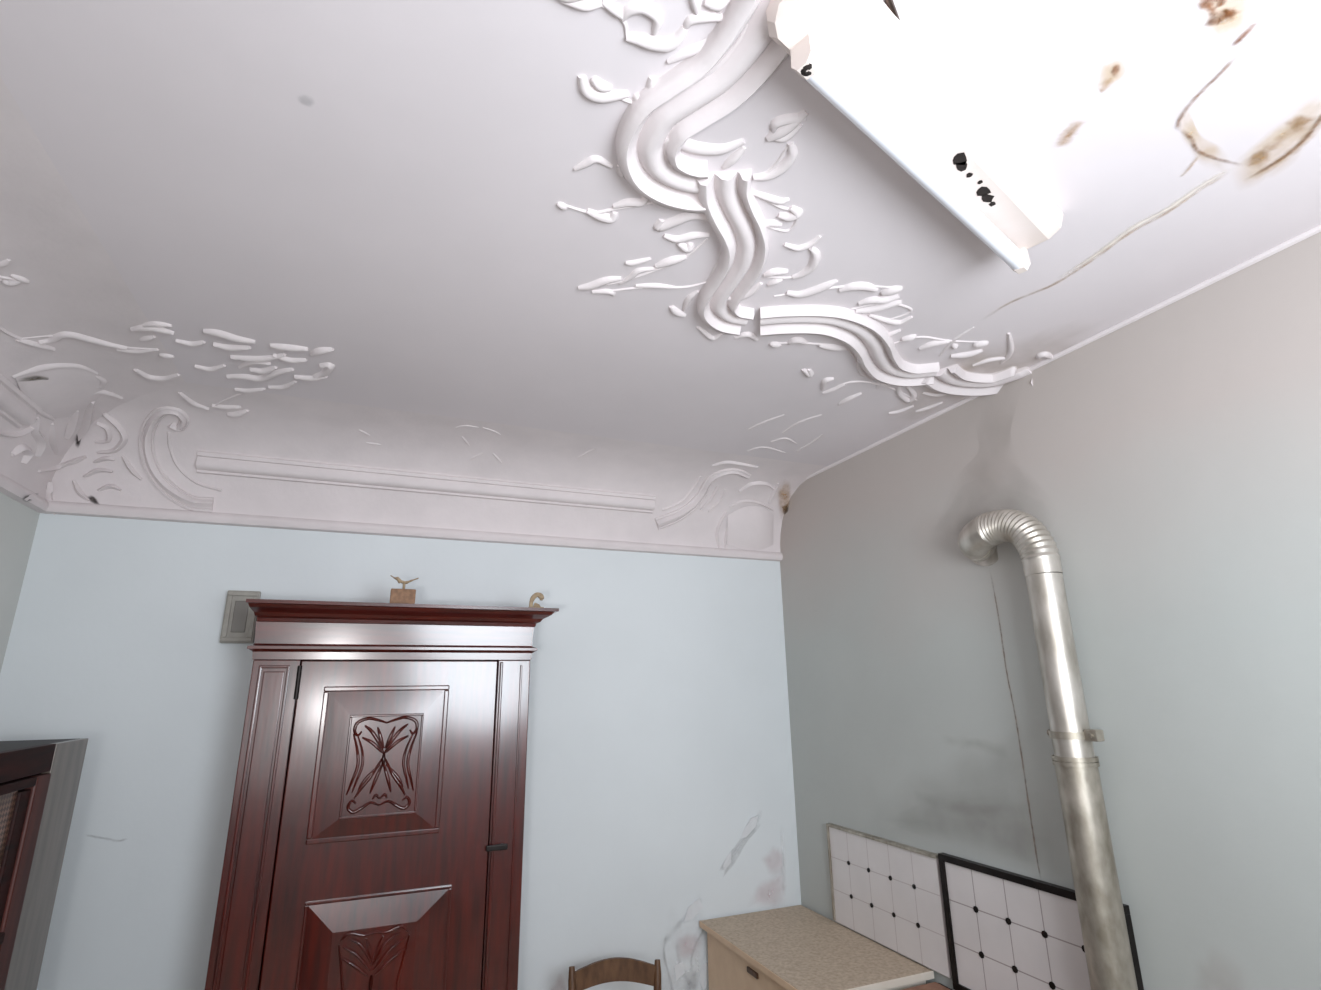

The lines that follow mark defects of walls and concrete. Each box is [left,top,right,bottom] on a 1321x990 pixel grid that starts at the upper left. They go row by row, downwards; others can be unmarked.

corrosion [1202,0,1233,24]
crack [1178,30,1250,159]